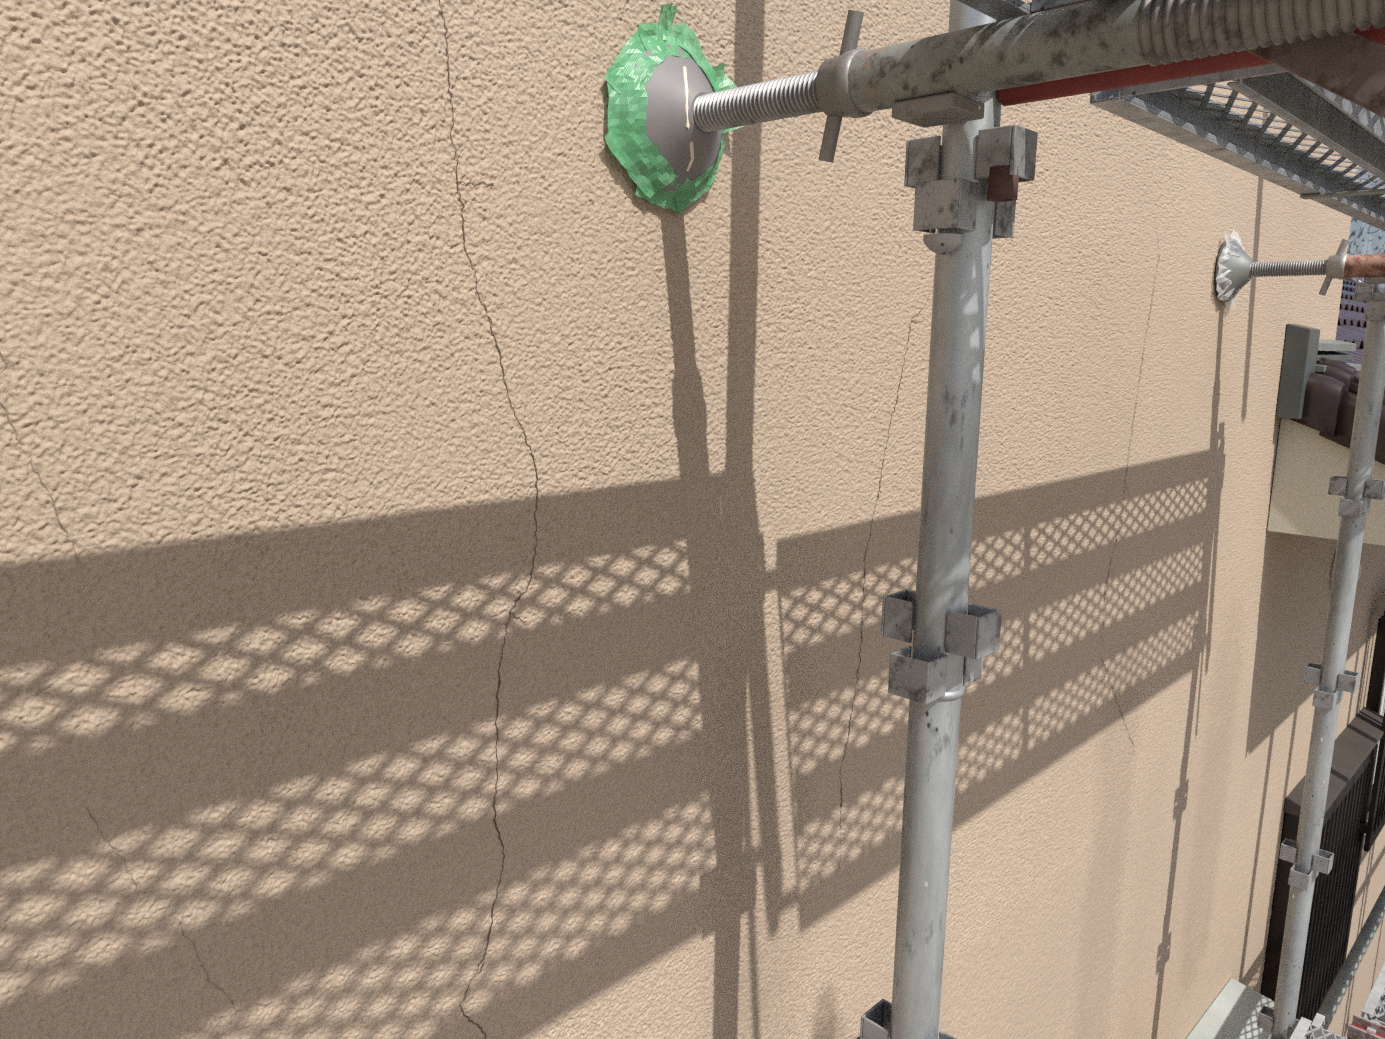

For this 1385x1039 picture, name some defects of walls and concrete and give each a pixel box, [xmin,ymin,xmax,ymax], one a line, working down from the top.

crack [439,0,538,1039]